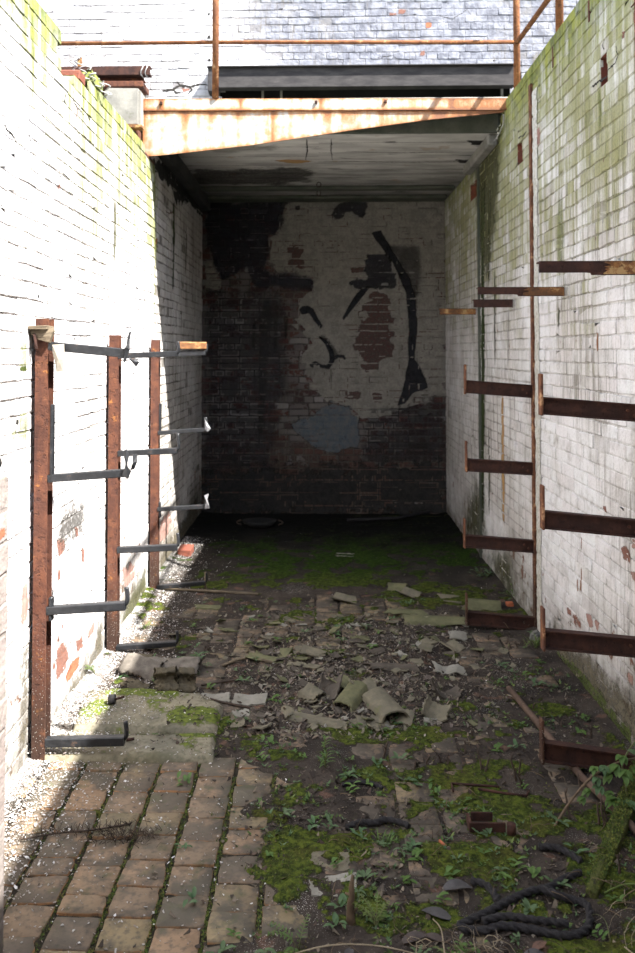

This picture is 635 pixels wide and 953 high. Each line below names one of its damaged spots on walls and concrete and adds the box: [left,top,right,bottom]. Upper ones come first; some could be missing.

peeling [287,245,305,269]
peeling [349,254,396,372]
damp [57,496,86,559]